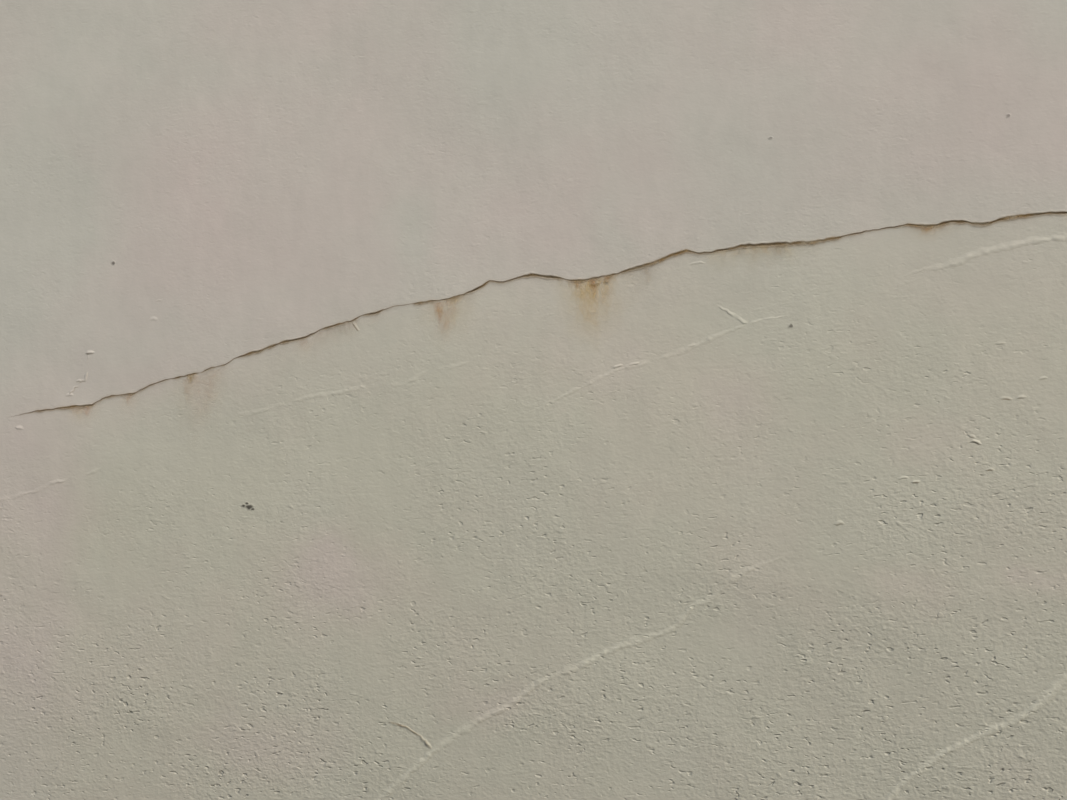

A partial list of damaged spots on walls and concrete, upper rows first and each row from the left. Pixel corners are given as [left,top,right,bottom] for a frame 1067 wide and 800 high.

crack [9,209,1067,417]
crack [373,548,801,800]
crack [882,670,1067,800]